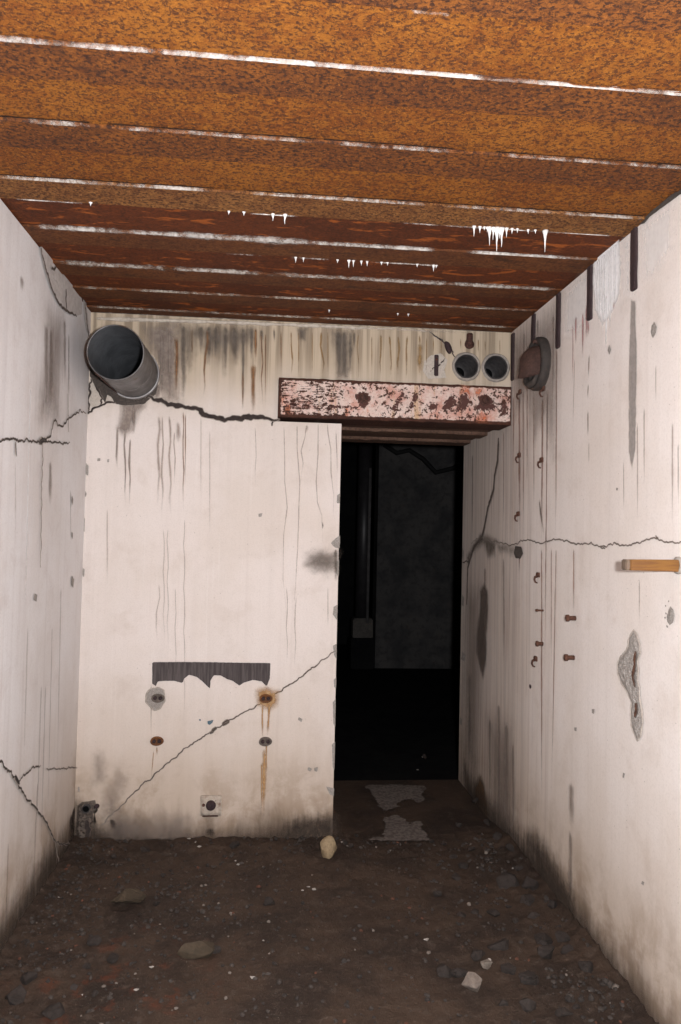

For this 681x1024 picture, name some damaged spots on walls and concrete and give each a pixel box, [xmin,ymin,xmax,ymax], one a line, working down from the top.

leakage [319,242,428,251]
leakage [97,306,452,396]
crack [146,395,280,426]
crack [462,438,681,604]
peeling [145,662,270,711]
crack [101,650,336,826]
rust [258,689,276,730]
spalling [617,629,643,741]
crack [0,759,77,858]